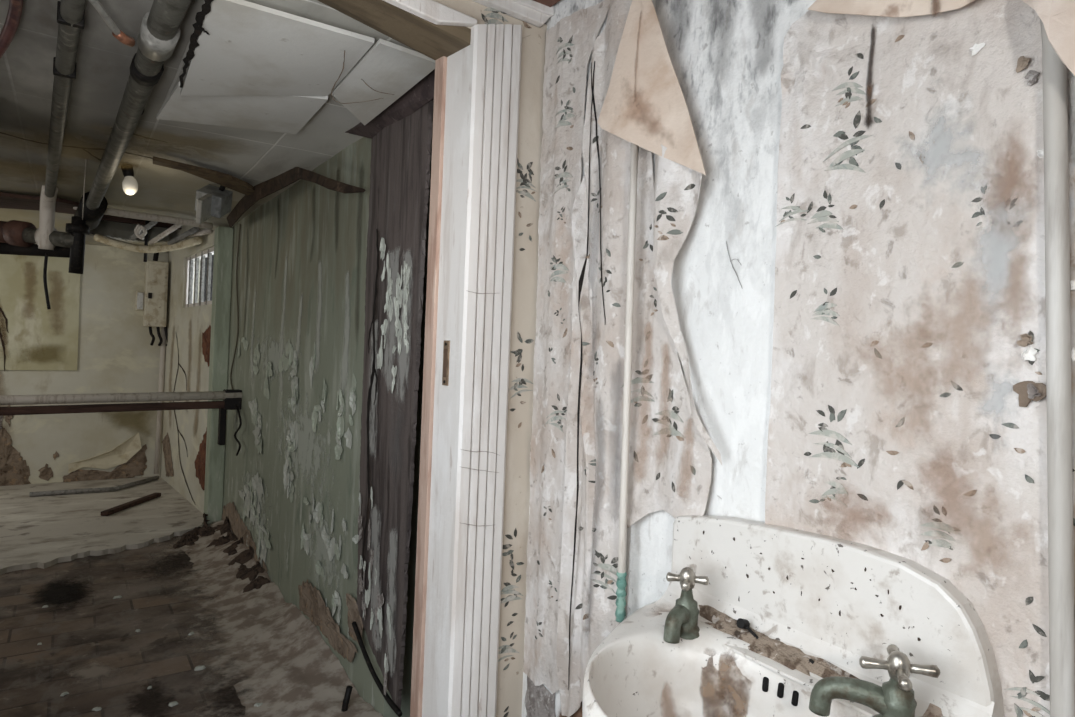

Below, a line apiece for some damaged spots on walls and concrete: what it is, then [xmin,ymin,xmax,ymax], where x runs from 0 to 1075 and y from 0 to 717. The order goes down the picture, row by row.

damp [30,348,58,361]
spalling [202,326,211,366]
peeling [377,238,411,393]
spalling [0,405,147,486]
peeling [222,473,271,572]
spalling [237,337,391,663]
damp [34,582,91,607]
spalling [525,676,556,717]